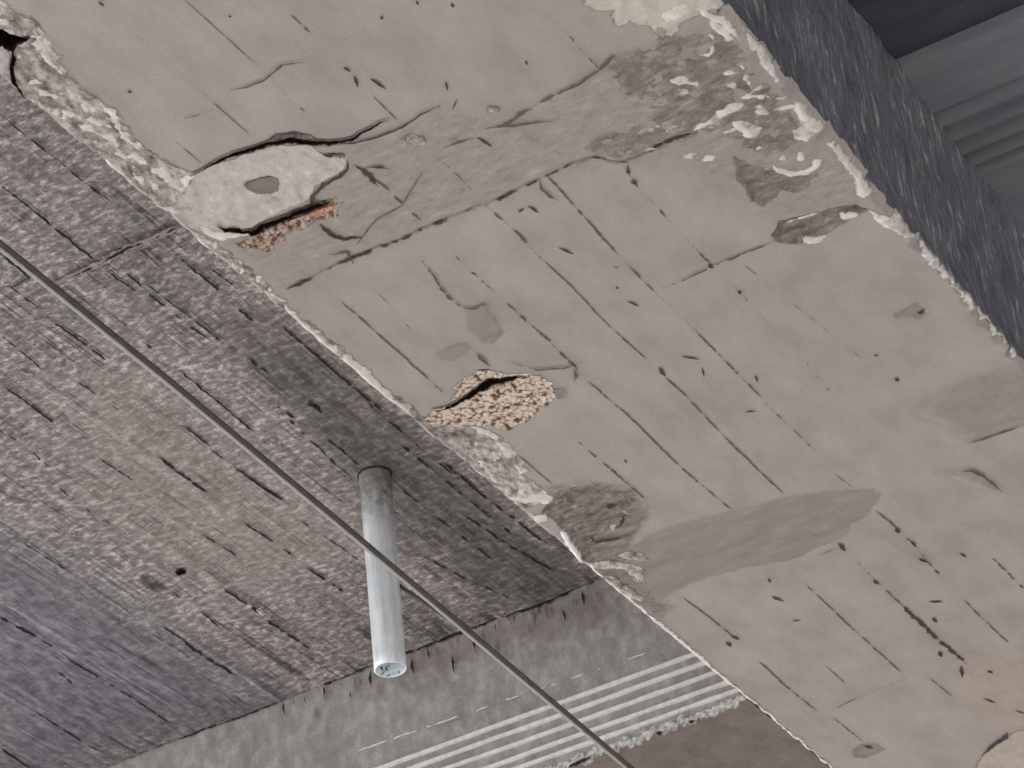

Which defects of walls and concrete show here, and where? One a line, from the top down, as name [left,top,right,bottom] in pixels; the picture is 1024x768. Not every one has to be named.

peeling [583,0,780,82]
spalling [0,0,431,427]
crack [189,106,440,186]
crack [219,172,468,289]
crack [445,55,615,148]
leakage [198,3,874,293]
crack [496,156,638,201]
crack [653,133,689,149]
spalling [694,64,823,207]
spalling [772,140,1017,358]
spalling [423,369,833,768]
leakage [629,486,884,603]